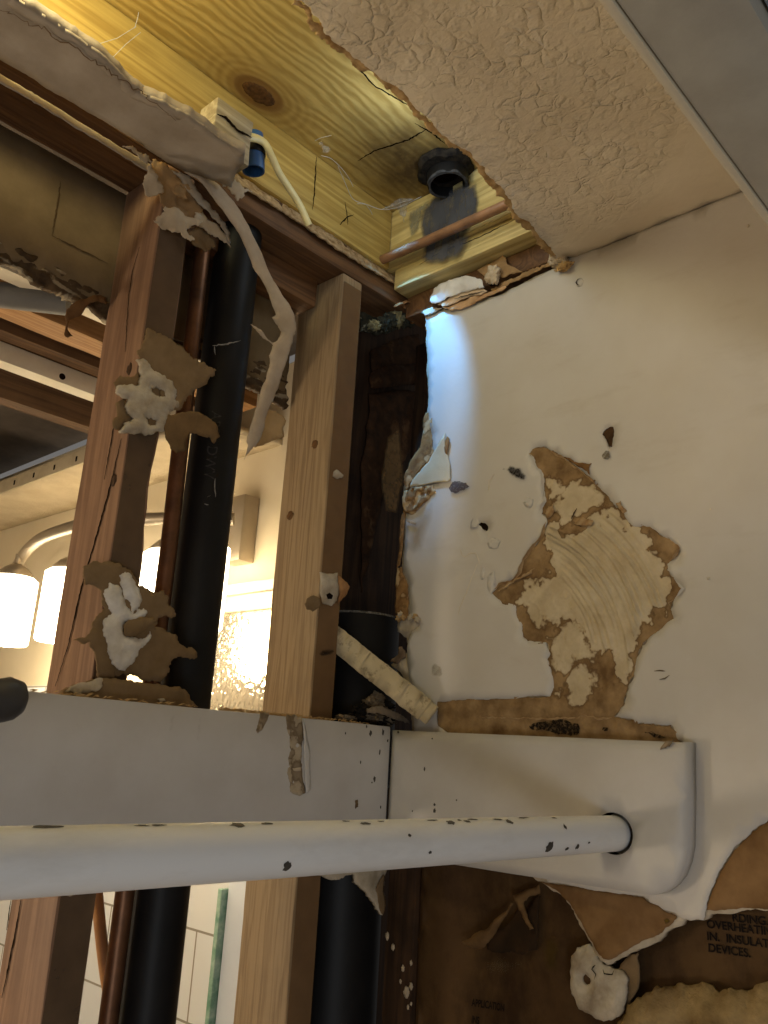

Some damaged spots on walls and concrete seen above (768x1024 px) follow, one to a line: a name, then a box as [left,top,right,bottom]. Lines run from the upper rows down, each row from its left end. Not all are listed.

crack [358,71,444,161]
water stain [410,186,477,261]
peeling [395,412,451,624]
peeling [437,447,685,750]
peeling [286,714,311,796]
peeling [706,822,768,911]
peeling [539,881,677,960]